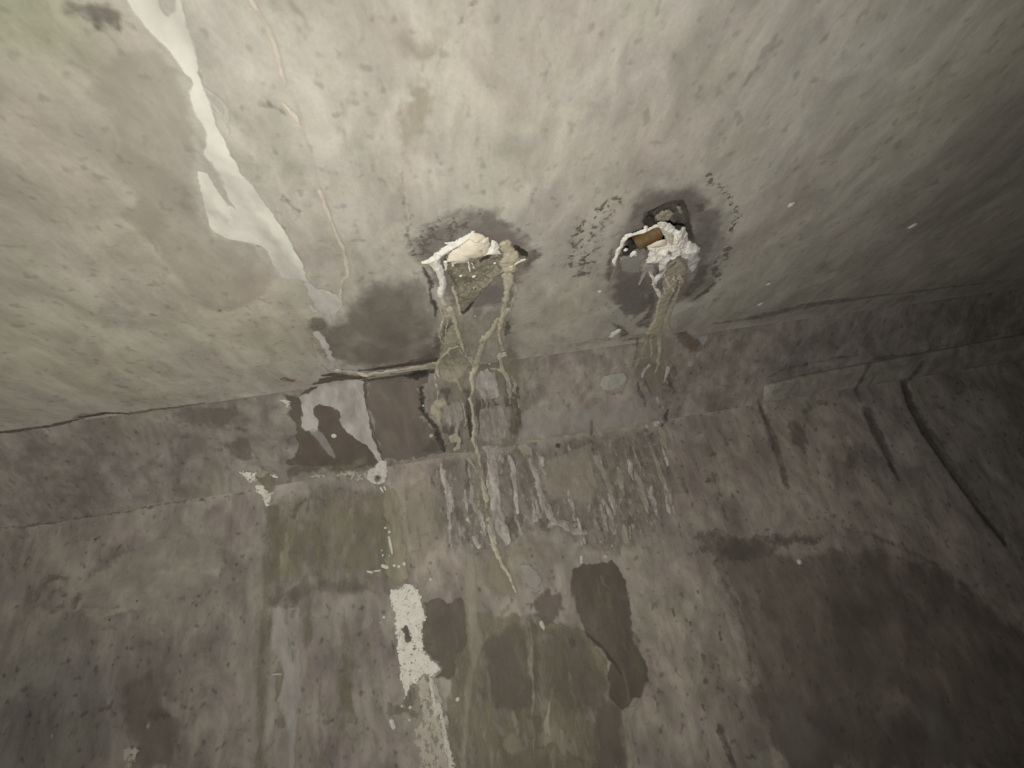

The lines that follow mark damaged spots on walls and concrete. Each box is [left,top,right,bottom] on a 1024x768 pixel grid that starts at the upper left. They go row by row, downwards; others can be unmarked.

crack [0,412,126,433]
crack [321,358,438,381]
leakage [127,0,649,768]
leakage [576,173,739,386]
peeling [387,584,456,768]